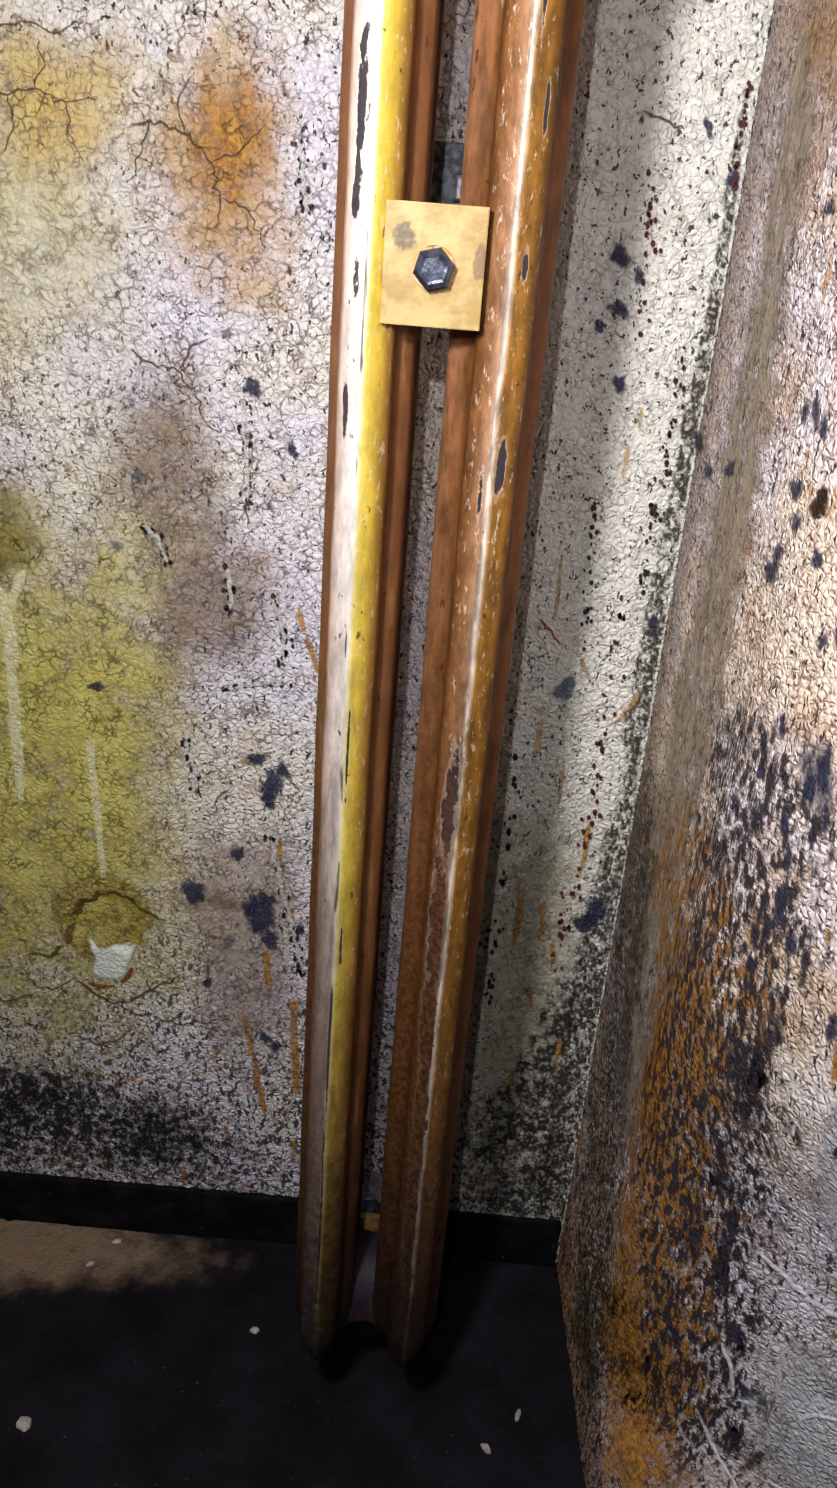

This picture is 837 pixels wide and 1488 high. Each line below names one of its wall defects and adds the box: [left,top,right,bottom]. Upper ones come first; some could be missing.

crack [0,20,96,162]
crack [127,76,266,247]
water stain [0,496,174,970]
flaking render [28,877,164,989]
water stain [0,1068,263,1183]
rust [603,954,721,1488]